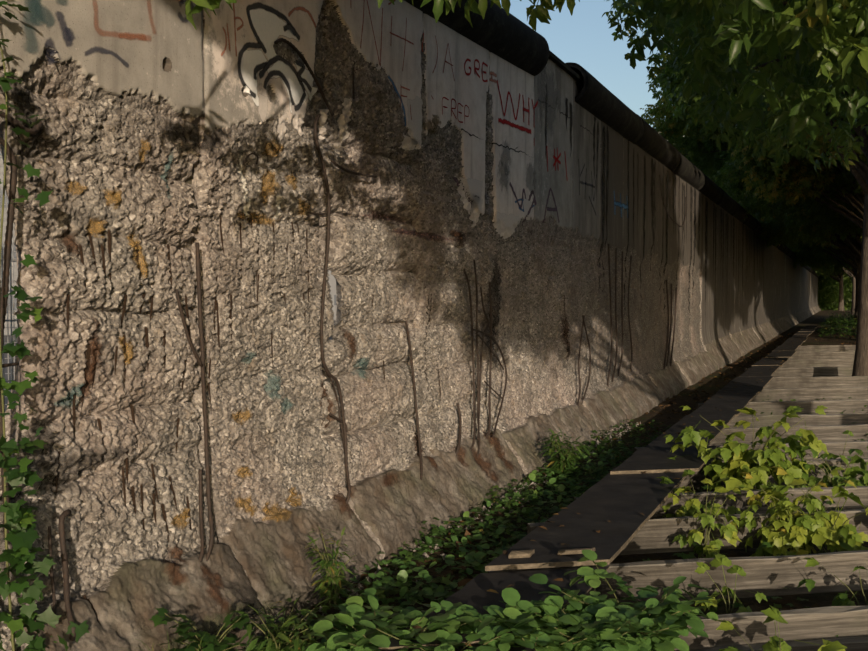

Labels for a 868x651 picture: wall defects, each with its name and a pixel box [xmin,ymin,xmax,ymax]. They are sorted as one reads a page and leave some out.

crack [461,129,527,155]
spalling [0,0,706,621]
rust [72,324,101,437]
rust [454,433,513,482]
rust [202,566,229,615]
spalling [0,621,21,651]